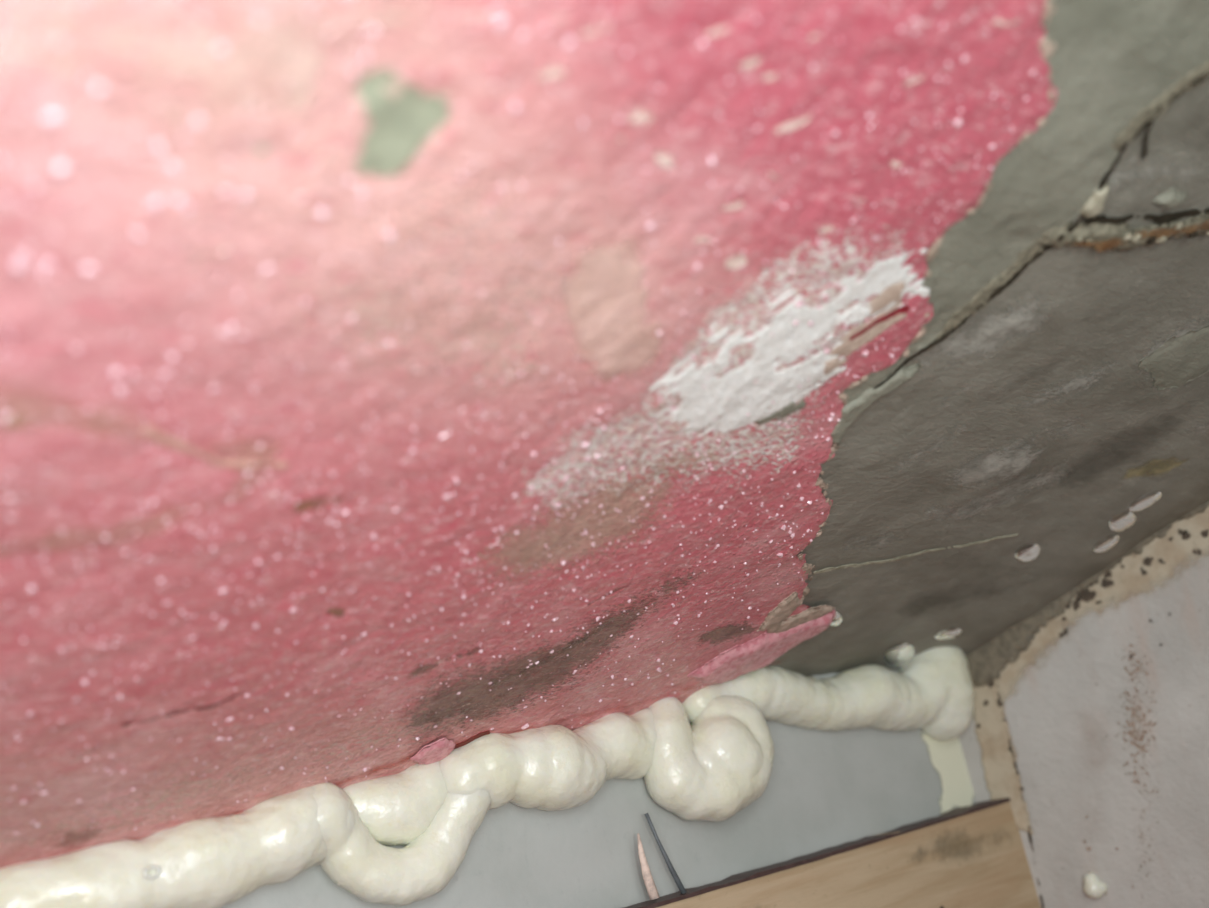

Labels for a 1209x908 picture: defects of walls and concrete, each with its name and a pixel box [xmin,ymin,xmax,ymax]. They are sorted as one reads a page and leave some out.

peeling [352,67,451,181]
spalling [506,0,1209,526]
crack [873,72,1209,390]
spalling [813,532,1018,574]
damp [1060,562,1124,637]
damp [1169,529,1208,555]
damp [401,572,700,743]